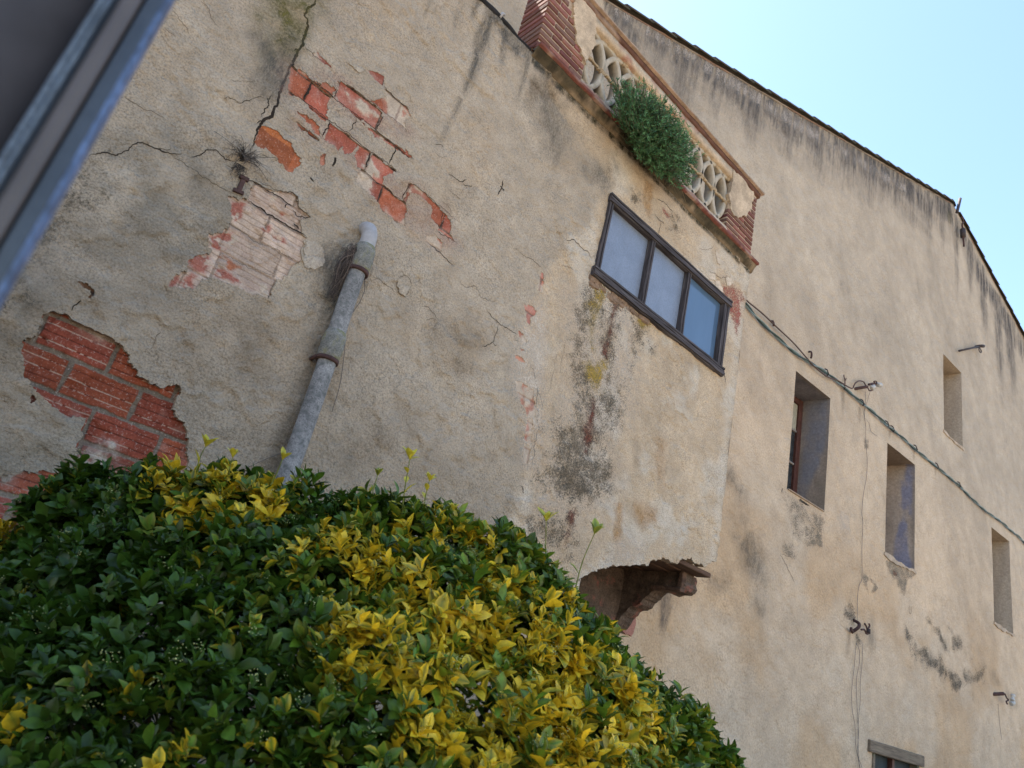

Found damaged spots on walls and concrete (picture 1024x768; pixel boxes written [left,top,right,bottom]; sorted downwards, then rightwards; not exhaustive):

spalling [21,311,189,478]